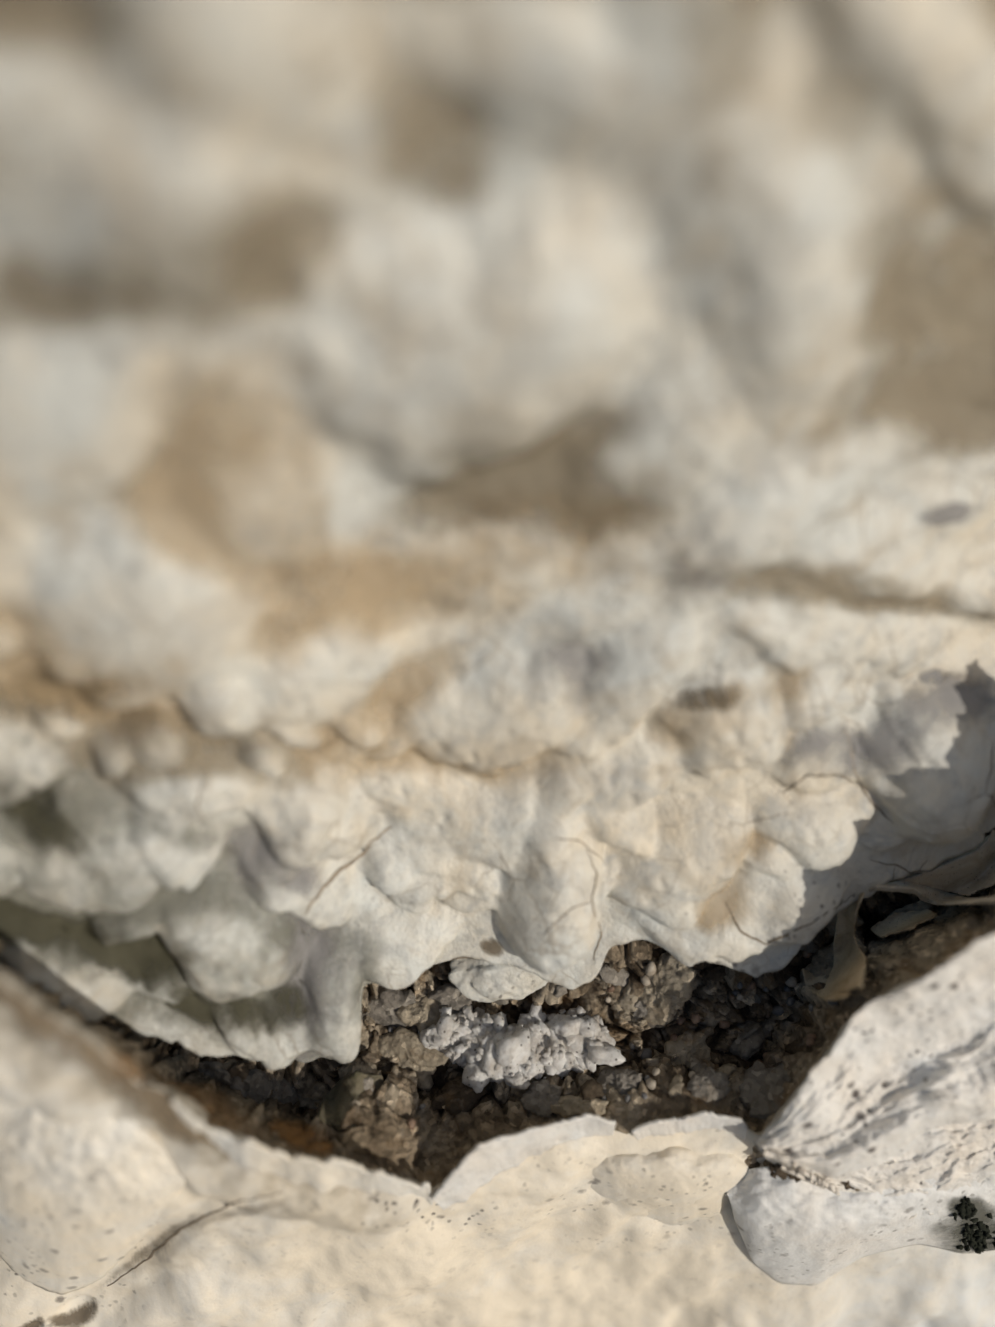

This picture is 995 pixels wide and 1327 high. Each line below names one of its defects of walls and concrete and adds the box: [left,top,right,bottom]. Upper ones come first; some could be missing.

crack [783,729,894,824]
crack [871,860,939,880]
crack [726,895,853,945]
spalling [0,885,995,1219]